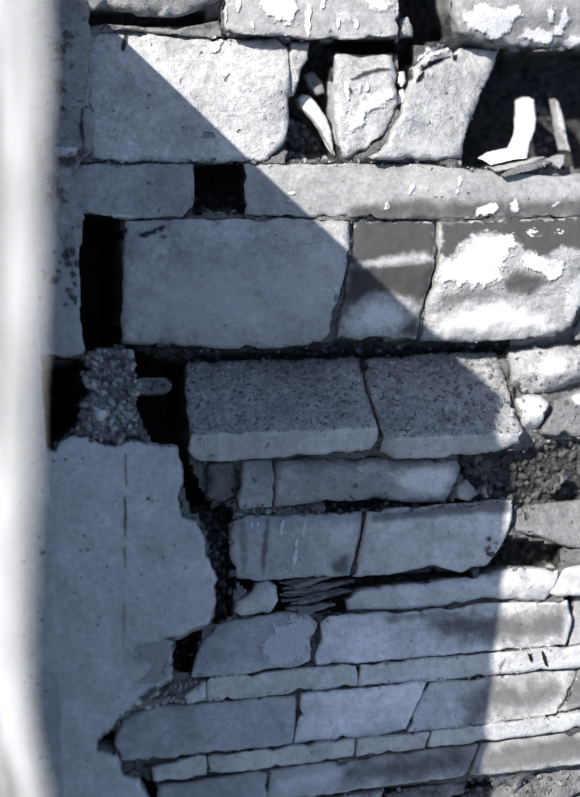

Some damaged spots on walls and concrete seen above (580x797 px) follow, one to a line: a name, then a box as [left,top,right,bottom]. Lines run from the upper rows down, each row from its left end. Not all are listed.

spalling [66,349,143,445]
flaking render [113,643,177,731]